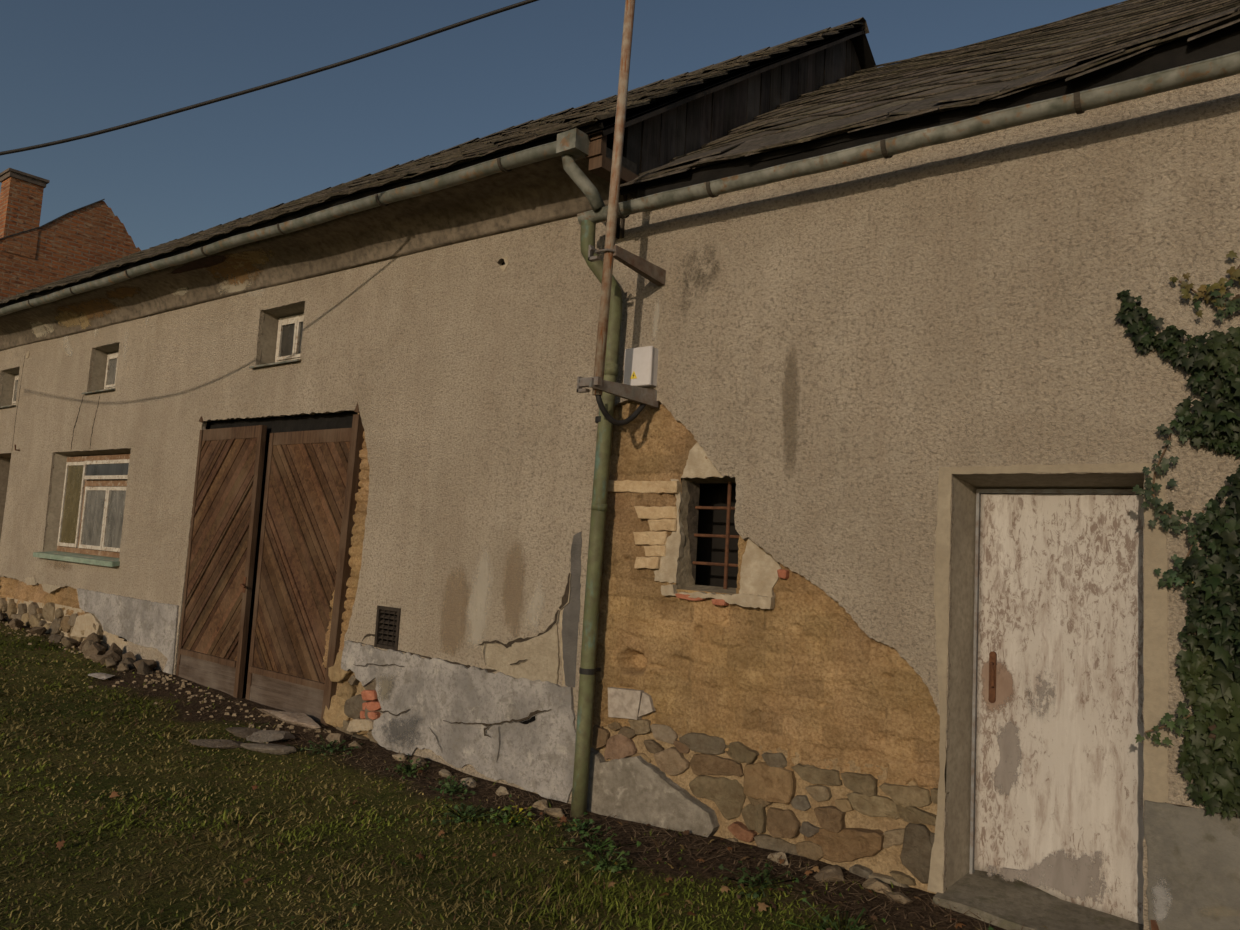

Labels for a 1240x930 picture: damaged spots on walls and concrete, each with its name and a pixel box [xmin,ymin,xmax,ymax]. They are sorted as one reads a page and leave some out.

damp [783,354,798,463]
spalling [0,576,128,655]
spalling [322,431,381,743]
crack [352,573,571,673]
spalling [587,401,949,894]